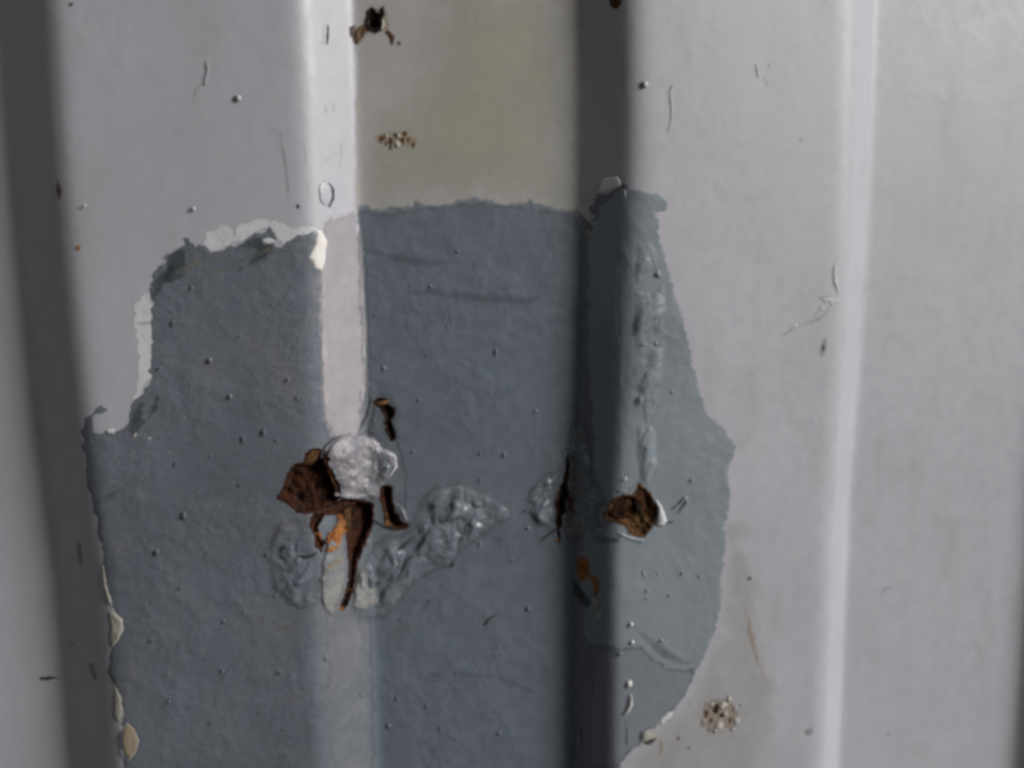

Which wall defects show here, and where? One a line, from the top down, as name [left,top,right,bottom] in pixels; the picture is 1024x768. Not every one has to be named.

rust [349,6,401,45]
rust [379,131,415,150]
peeling [204,218,327,270]
peeling [132,293,153,401]
rust [305,450,356,552]
peeling [101,564,123,647]
peeling [108,672,138,761]